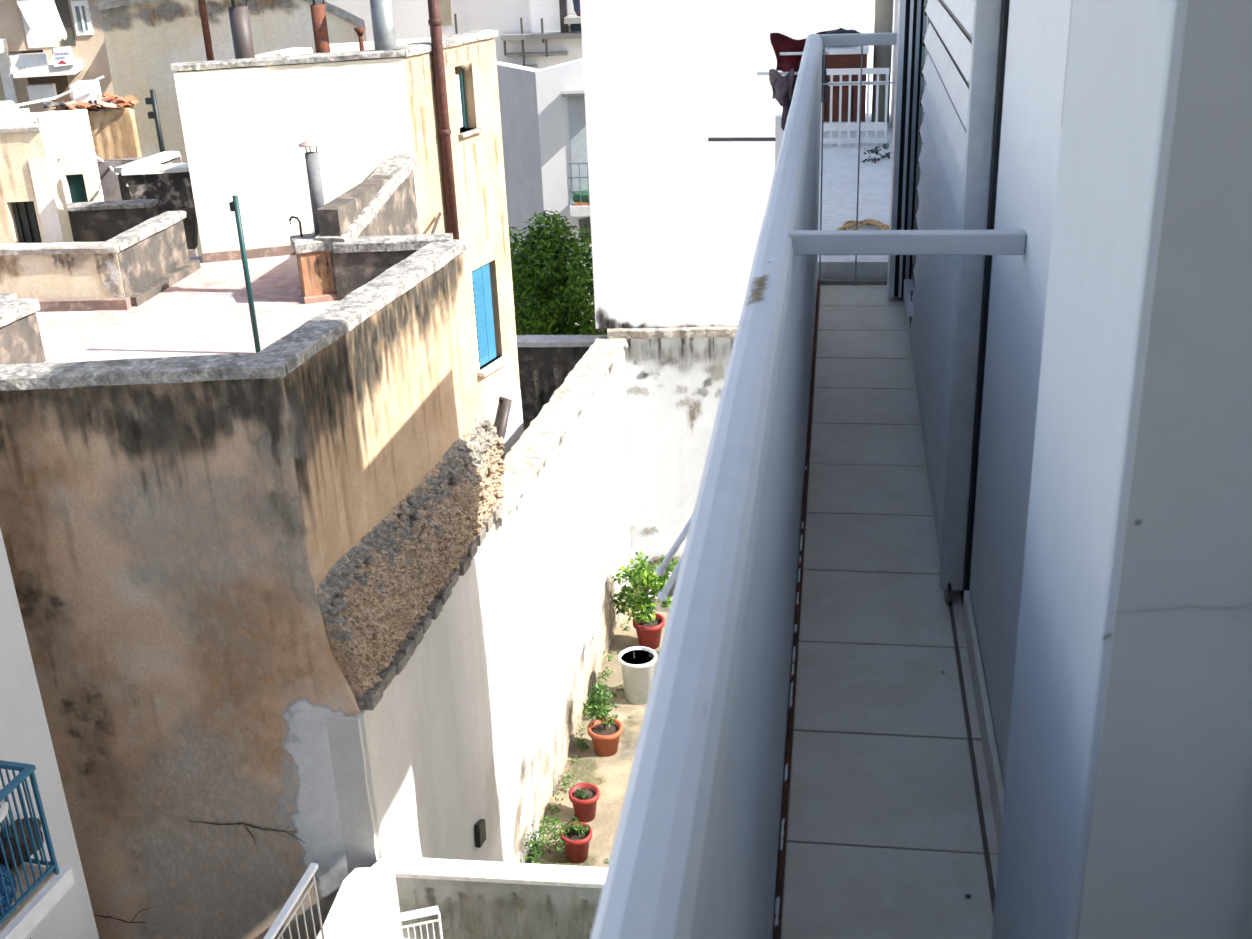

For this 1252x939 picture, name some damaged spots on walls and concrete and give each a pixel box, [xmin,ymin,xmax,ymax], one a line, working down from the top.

water stain [0,255,462,524]
spalling [311,343,628,710]
crack [188,820,305,847]